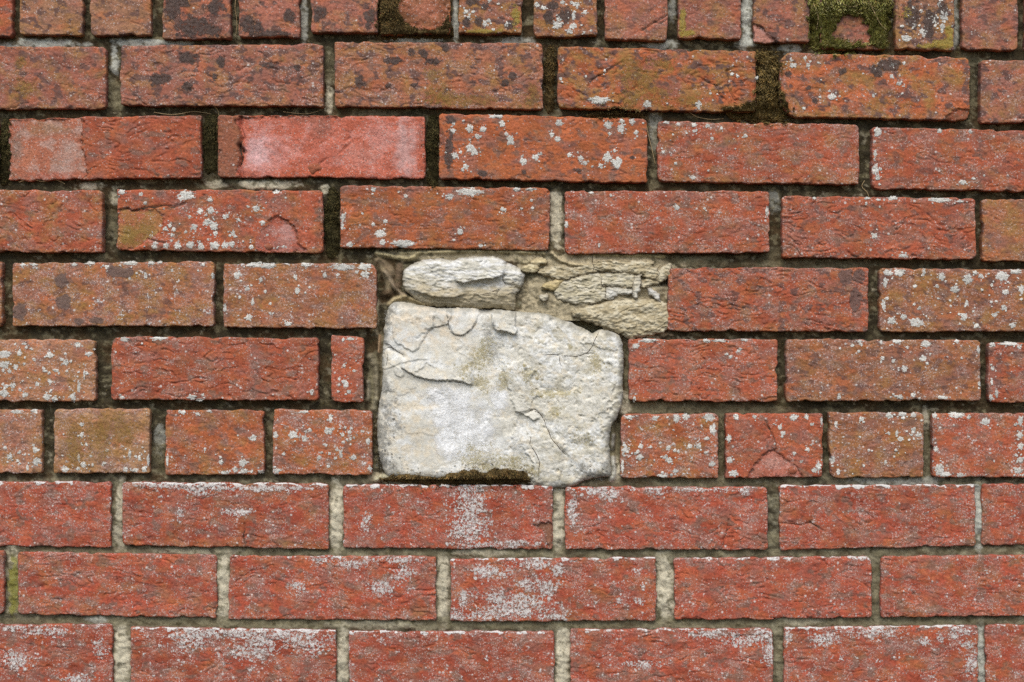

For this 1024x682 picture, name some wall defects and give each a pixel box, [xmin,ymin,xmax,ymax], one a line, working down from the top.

leakage [869,57,902,79]
crack [386,343,473,386]
crack [527,409,566,472]